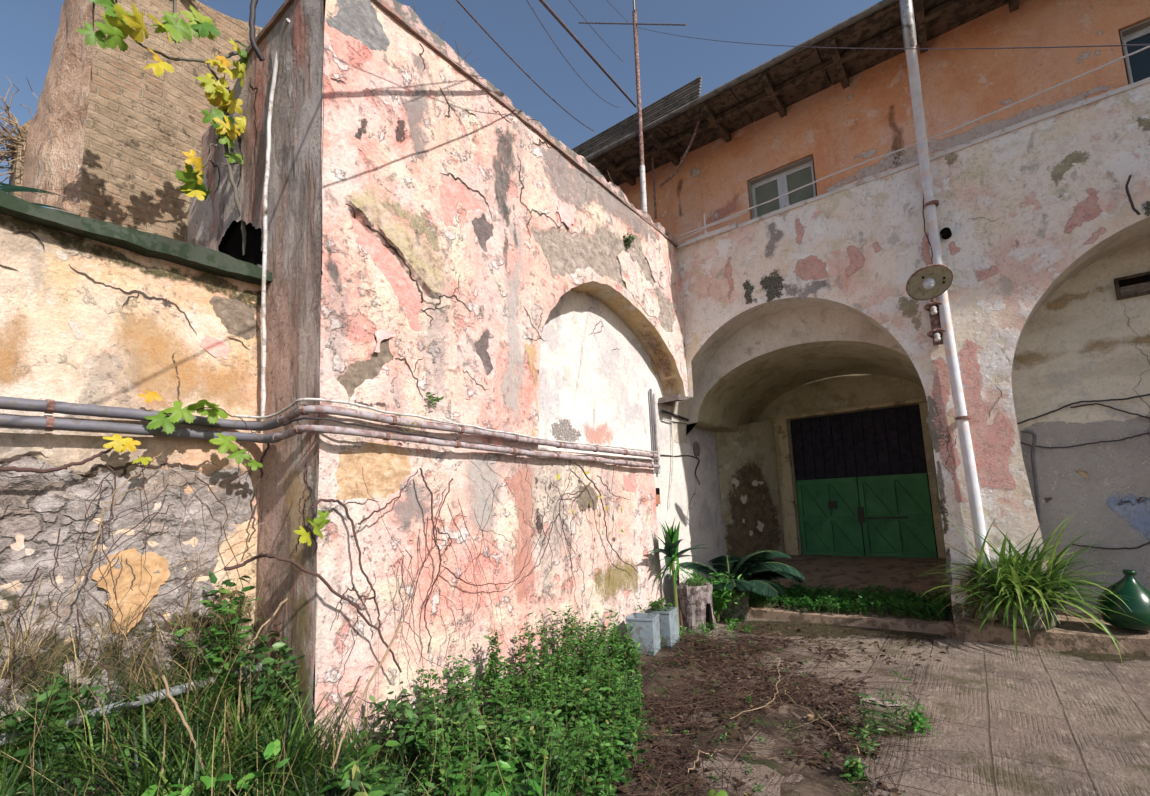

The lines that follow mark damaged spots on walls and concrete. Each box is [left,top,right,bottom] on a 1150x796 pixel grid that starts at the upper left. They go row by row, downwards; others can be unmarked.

spalling [326,0,390,52]
crack [419,44,511,123]
crack [440,172,493,220]
crack [517,139,577,240]
spalling [531,200,676,332]
crack [69,265,197,402]
spalling [337,329,394,397]
crack [0,451,50,464]
crack [77,460,220,478]
crack [302,461,318,564]
peeling [926,339,1016,618]
crack [102,555,140,601]